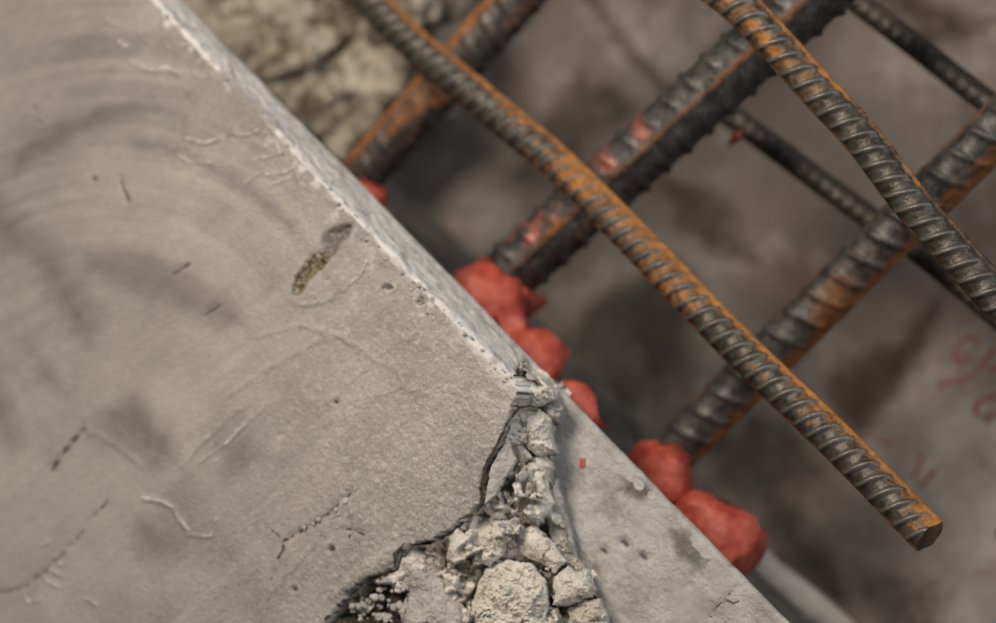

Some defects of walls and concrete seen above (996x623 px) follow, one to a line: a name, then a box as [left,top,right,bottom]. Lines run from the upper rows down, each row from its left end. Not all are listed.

spalling [182,0,996,552]
crack [324,543,405,620]
spalling [331,361,611,623]
crack [459,405,534,520]